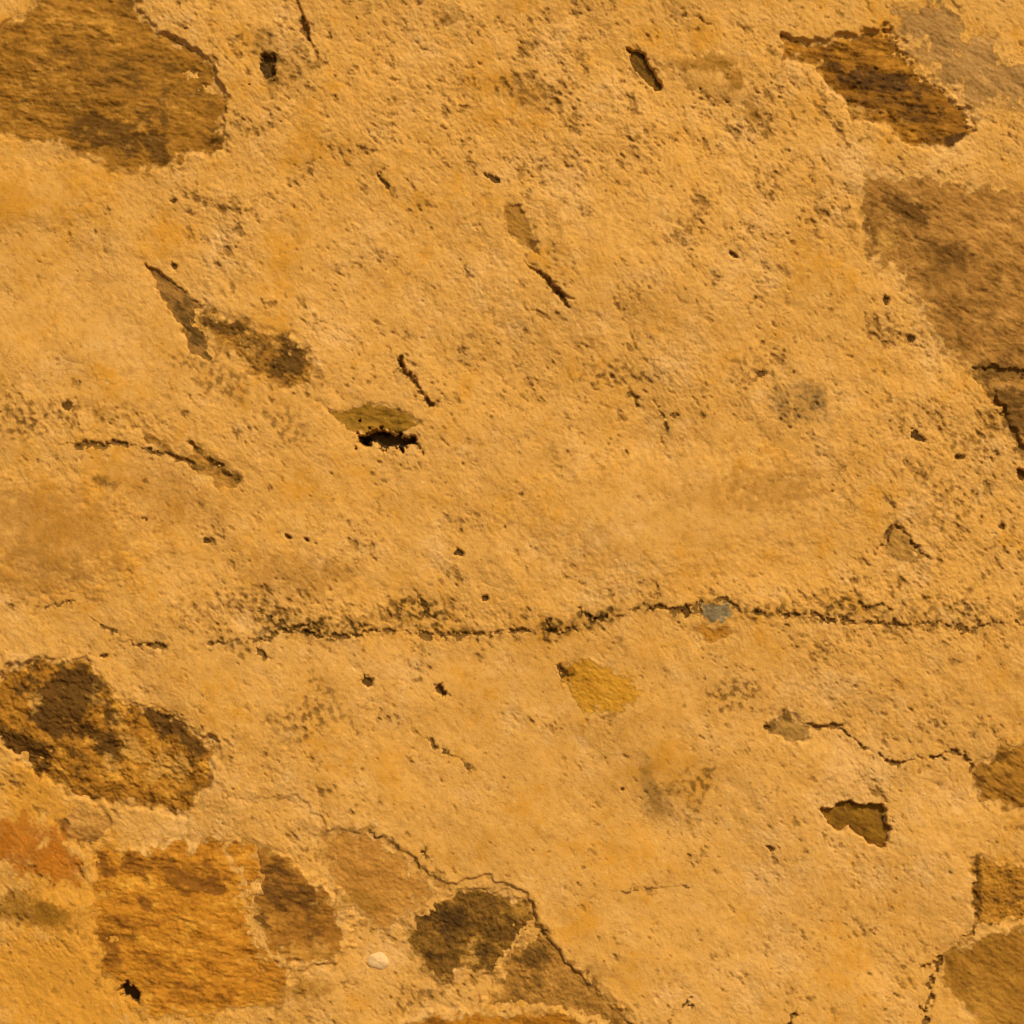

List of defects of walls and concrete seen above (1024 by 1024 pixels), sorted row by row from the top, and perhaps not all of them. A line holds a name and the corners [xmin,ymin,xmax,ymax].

spalling [0,0,237,182]
spalling [769,0,1024,158]
spalling [135,252,428,453]
spalling [846,164,1024,481]
crack [100,624,167,650]
crack [253,595,1019,661]
spalling [0,648,647,1024]
crack [368,829,440,880]
spalling [820,800,890,848]
crack [813,723,975,772]
spalling [932,845,1024,1024]